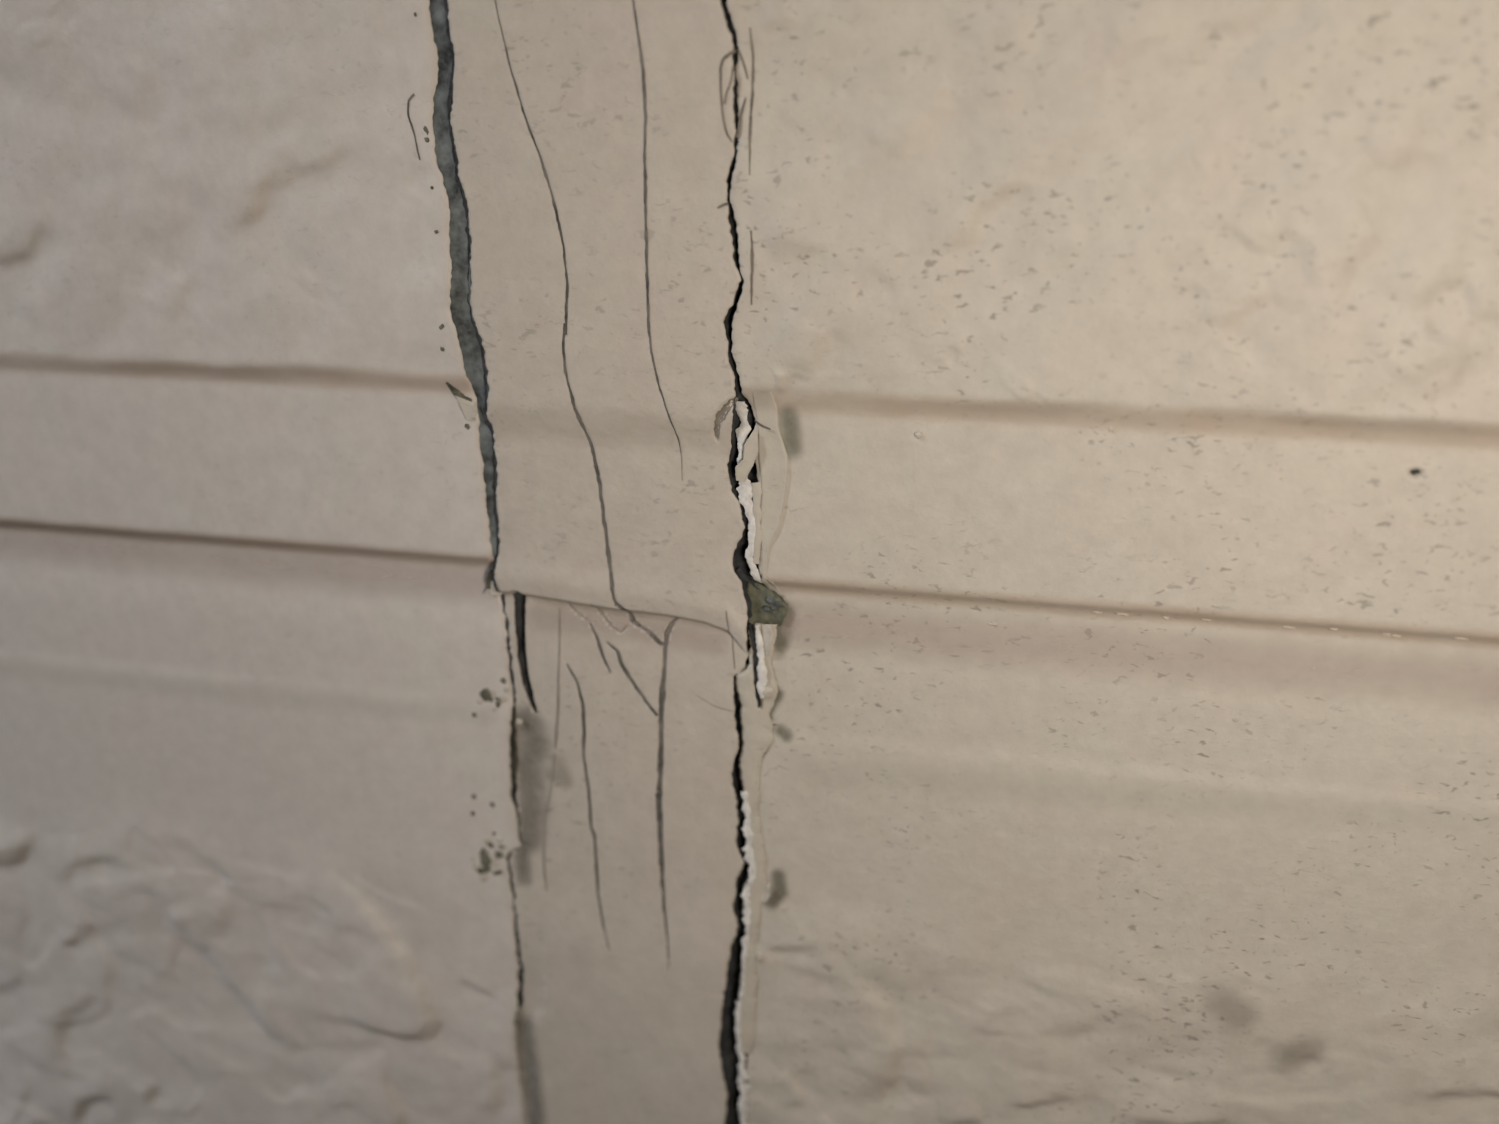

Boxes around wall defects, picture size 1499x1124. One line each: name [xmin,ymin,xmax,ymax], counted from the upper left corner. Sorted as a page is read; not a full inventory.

crack [407,0,785,1124]
peeling [735,392,788,699]